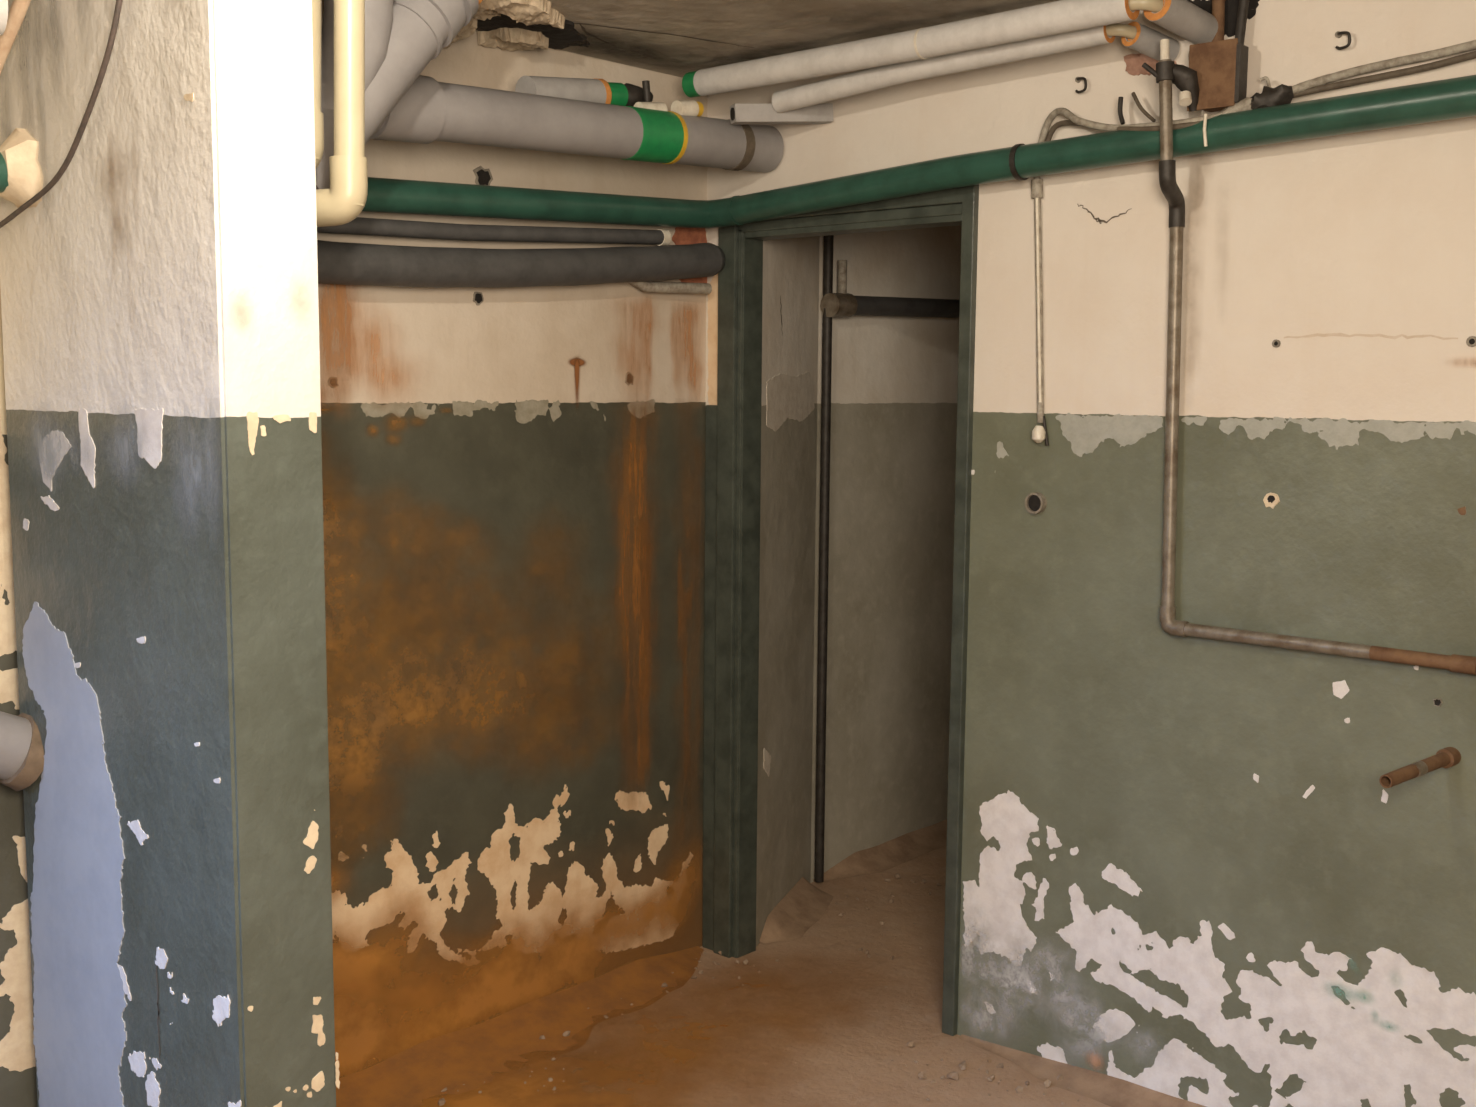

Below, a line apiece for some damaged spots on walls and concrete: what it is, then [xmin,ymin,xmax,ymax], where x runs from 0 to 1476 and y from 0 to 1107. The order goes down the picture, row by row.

spalling [444,0,590,51]
rust [321,284,397,383]
rust [569,358,585,400]
peeling [1181,416,1476,450]
peeling [0,408,164,1107]
peeling [303,809,319,874]
peeling [332,781,693,966]
peeling [963,790,1079,994]
peeling [212,995,253,1027]
peeling [273,997,340,1107]
rust [333,862,700,1078]
peeling [1056,863,1476,1107]